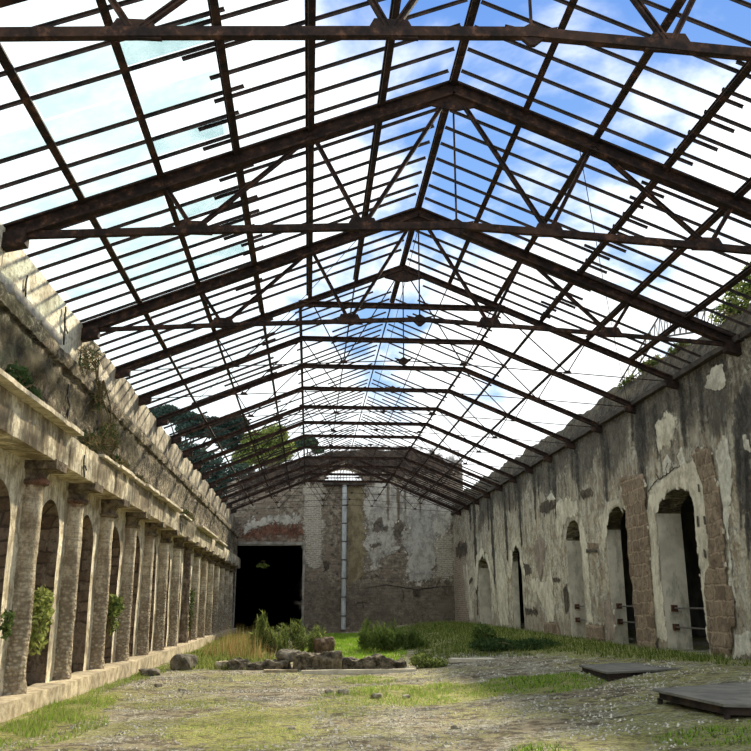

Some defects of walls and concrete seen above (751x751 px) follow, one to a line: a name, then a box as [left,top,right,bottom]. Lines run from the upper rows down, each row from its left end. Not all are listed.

flaking render [300,483,327,569]
water stain [469,347,751,584]
flaking render [618,435,737,660]